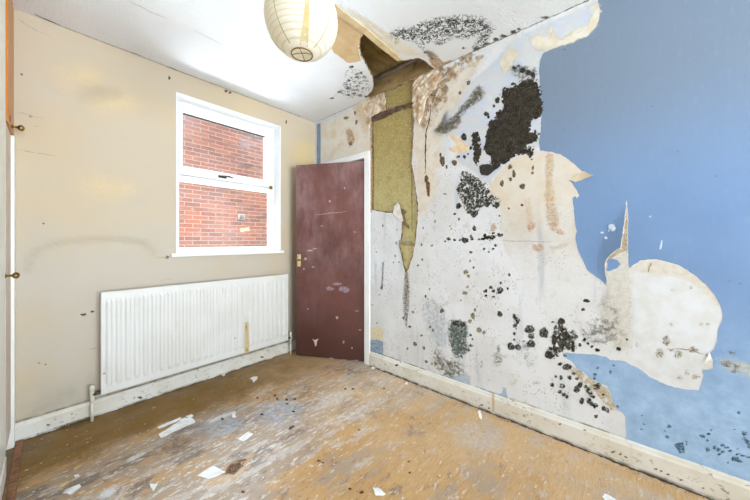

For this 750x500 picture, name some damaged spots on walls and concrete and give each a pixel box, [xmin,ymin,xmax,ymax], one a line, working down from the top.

leakage [287,65,374,165]
spalling [359,37,441,326]
leakage [348,8,544,253]
leakage [406,288,485,378]
leakage [492,301,628,418]